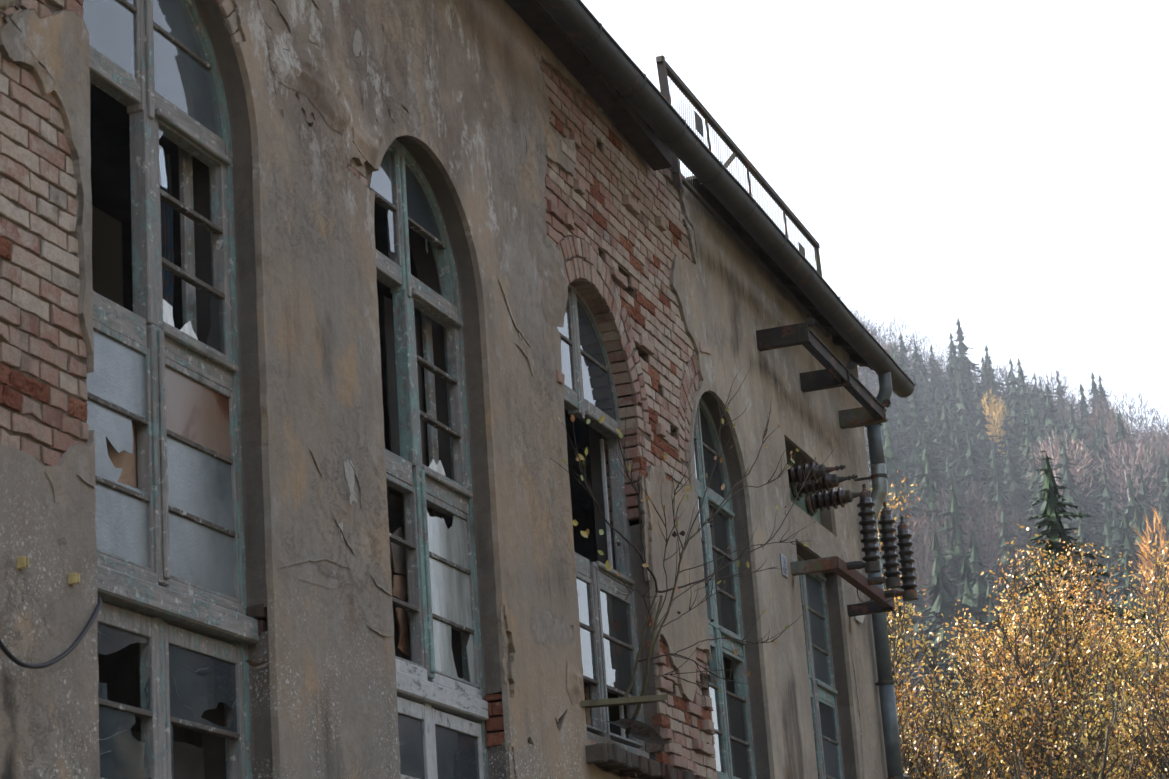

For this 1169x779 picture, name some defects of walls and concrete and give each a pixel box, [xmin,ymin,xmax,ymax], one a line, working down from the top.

flaking render [0,0,84,27]
flaking render [216,0,246,43]
flaking render [0,44,89,502]
flaking render [533,46,711,486]
flaking render [645,615,717,779]